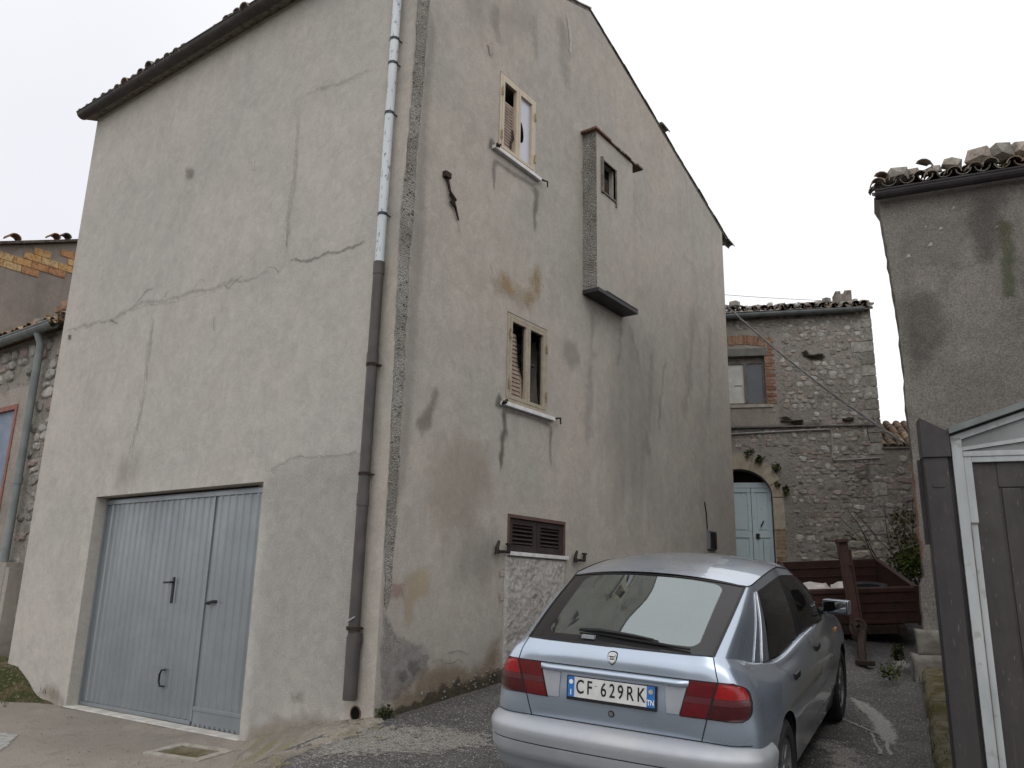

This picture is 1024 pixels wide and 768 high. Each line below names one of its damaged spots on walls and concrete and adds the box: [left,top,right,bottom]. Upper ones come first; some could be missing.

water stain [313,648,503,758]